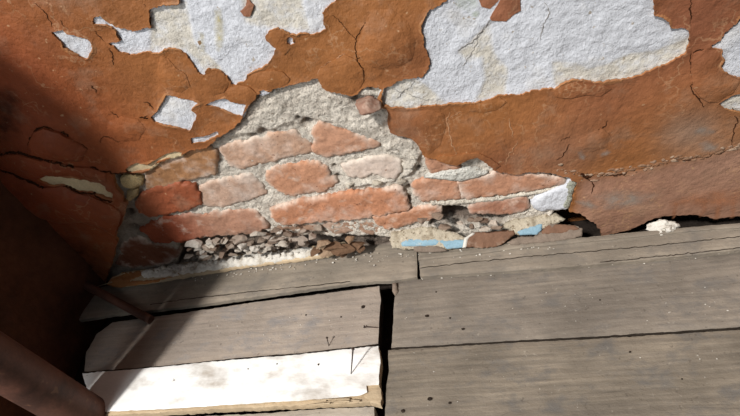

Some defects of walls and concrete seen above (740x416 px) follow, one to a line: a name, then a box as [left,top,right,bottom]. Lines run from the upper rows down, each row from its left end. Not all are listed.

peeling [53,30,97,60]
crack [317,13,370,81]
crack [688,0,704,107]
crack [0,126,136,203]
peeling [41,176,114,201]
flaking render [92,0,740,281]